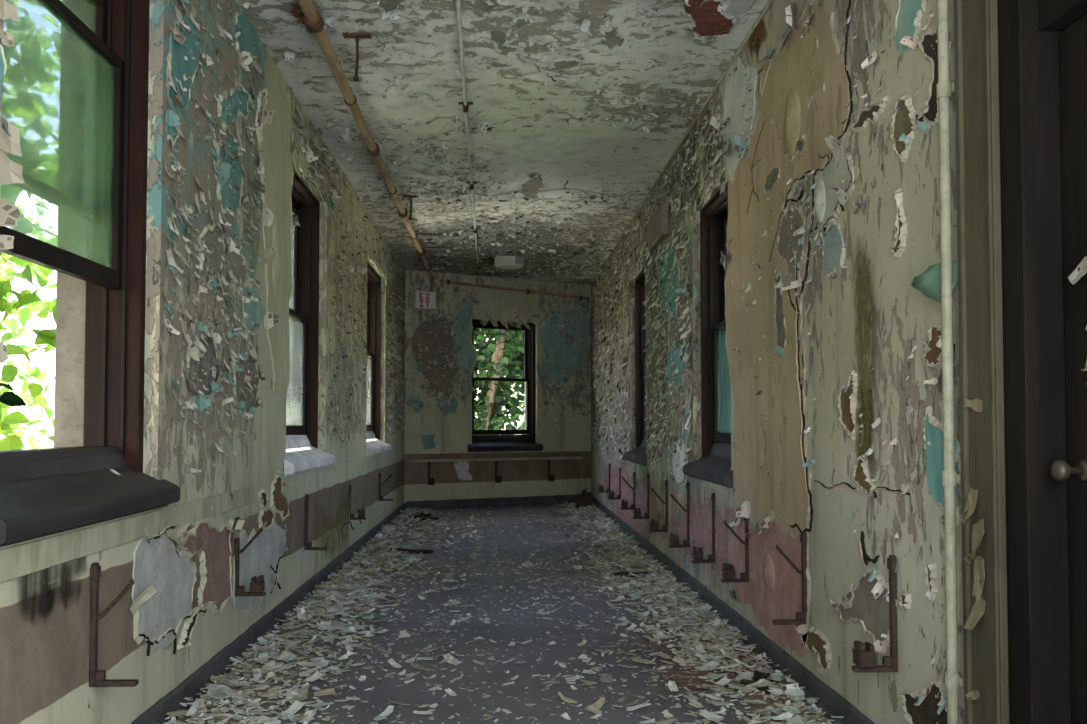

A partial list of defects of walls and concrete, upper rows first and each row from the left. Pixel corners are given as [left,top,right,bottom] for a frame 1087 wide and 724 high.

peeling [163,0,958,678]
crack [747,0,911,533]
peeling [963,398,983,412]
peeling [130,470,292,656]
peeling [164,501,844,724]
spalling [902,658,947,724]
peeling [909,405,986,630]